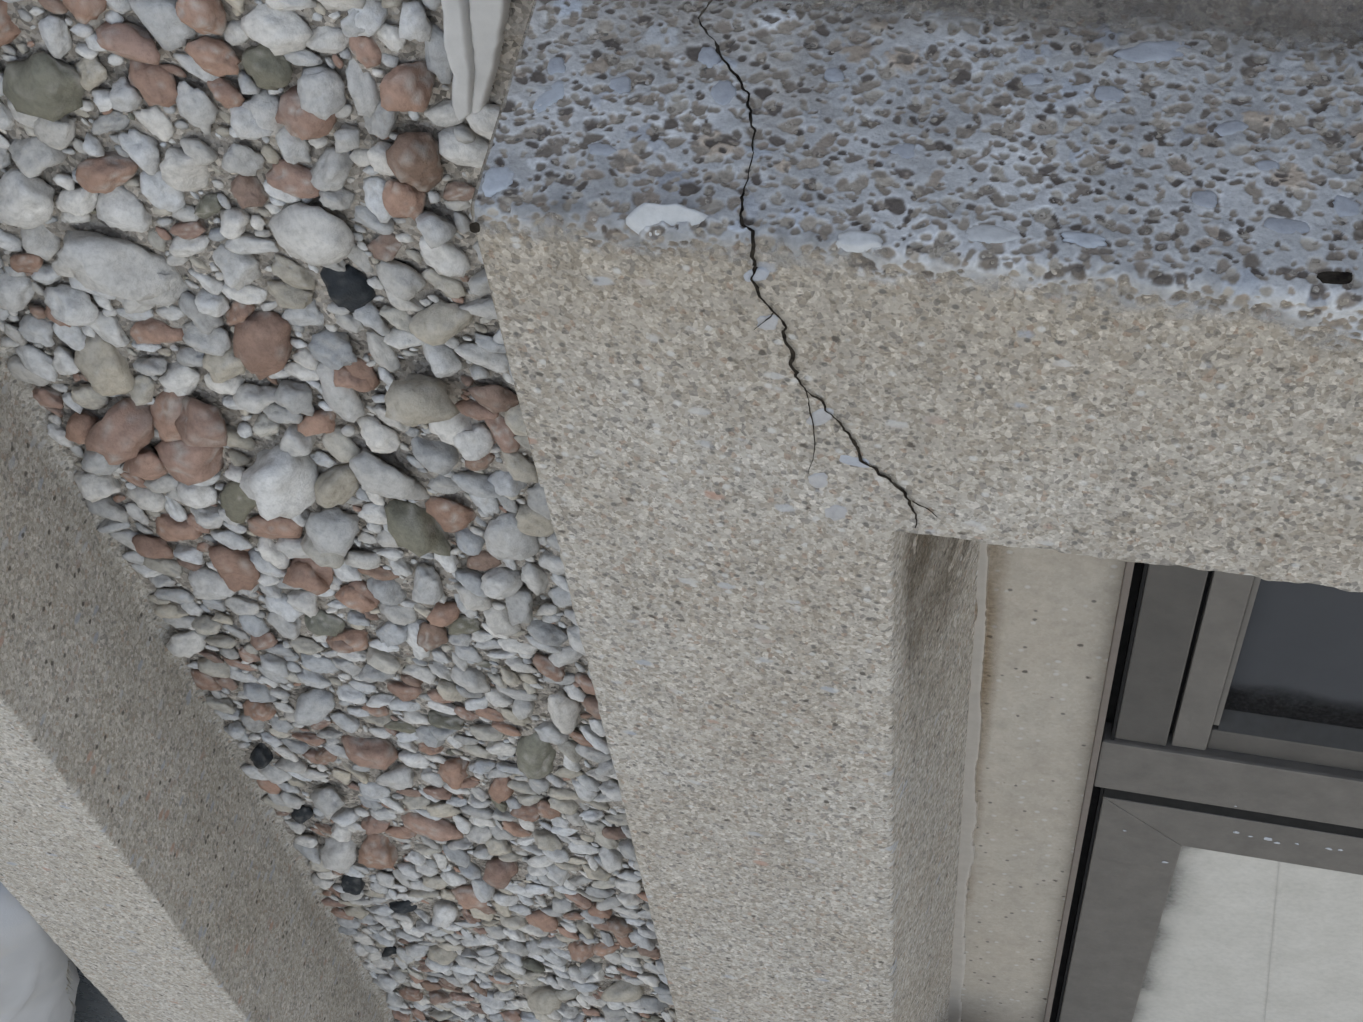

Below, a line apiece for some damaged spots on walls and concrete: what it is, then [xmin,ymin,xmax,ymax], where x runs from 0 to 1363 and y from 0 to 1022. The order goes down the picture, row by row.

crack [698,0,937,528]